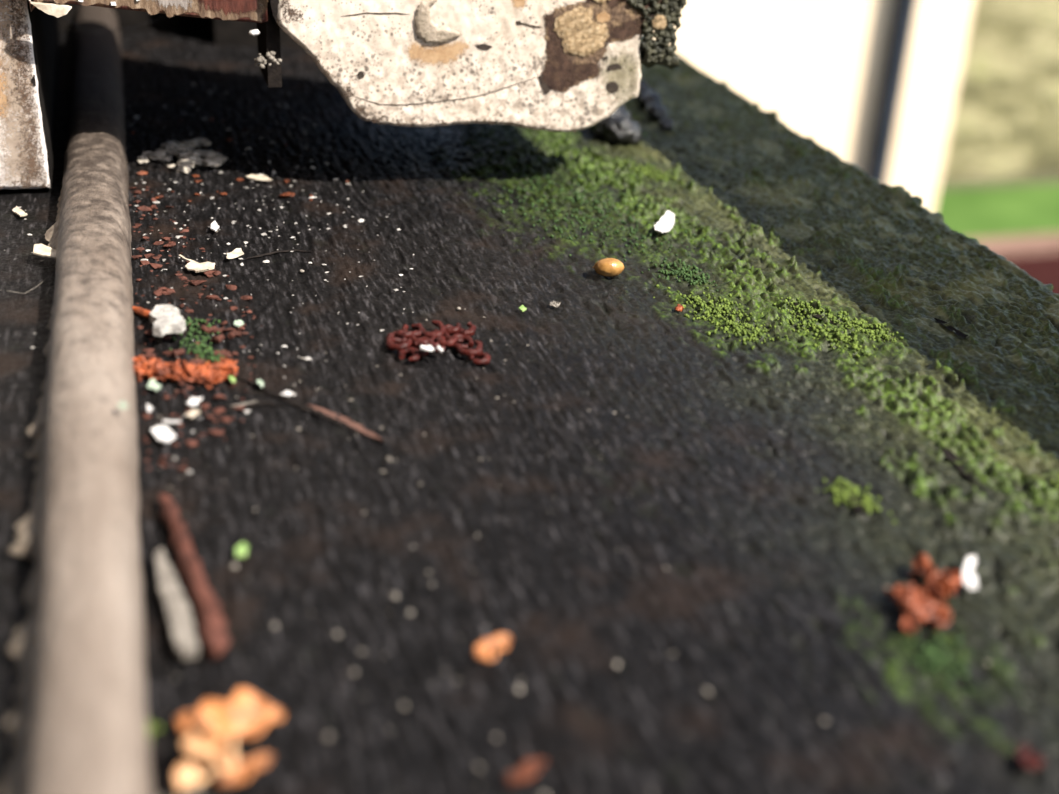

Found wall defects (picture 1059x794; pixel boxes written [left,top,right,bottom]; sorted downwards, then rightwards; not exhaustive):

leakage [0,0,47,189]
peeling [37,0,268,36]
leakage [312,54,583,132]
peeling [538,0,679,95]